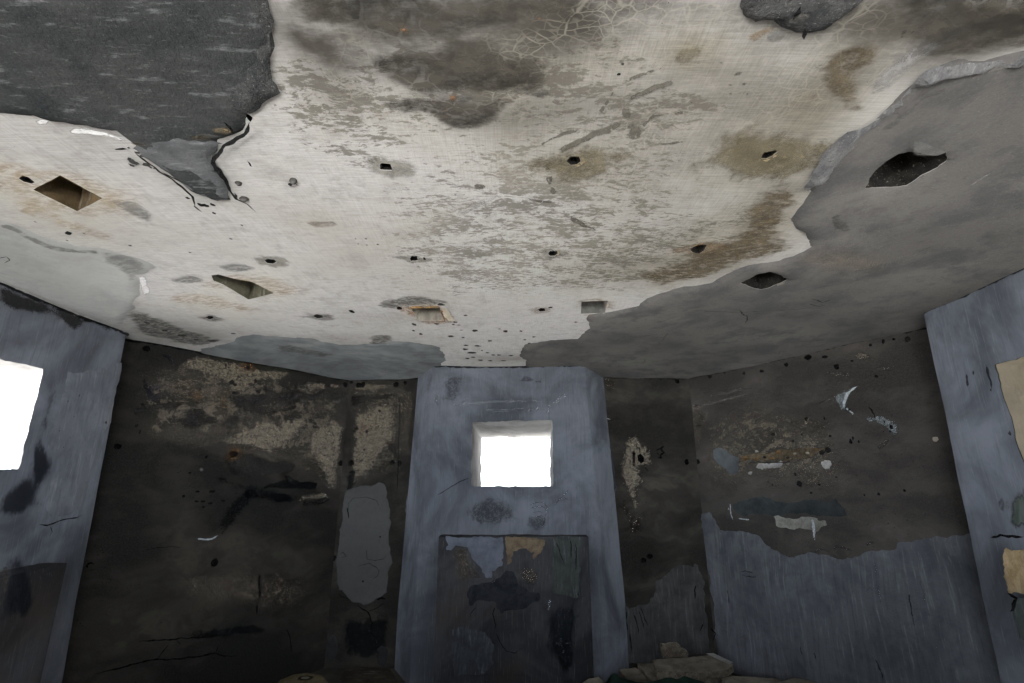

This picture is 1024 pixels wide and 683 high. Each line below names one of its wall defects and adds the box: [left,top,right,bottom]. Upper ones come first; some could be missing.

damp [375,55,547,128]
damp [825,47,873,109]
peeling [71,128,121,140]
crack [211,121,252,209]
spalling [530,70,672,203]
hole [542,249,567,259]
hole [690,243,706,254]
damp [643,190,793,285]
peeling [135,356,407,501]
peeling [620,437,651,508]
peeling [696,406,845,494]
peeling [446,536,545,614]